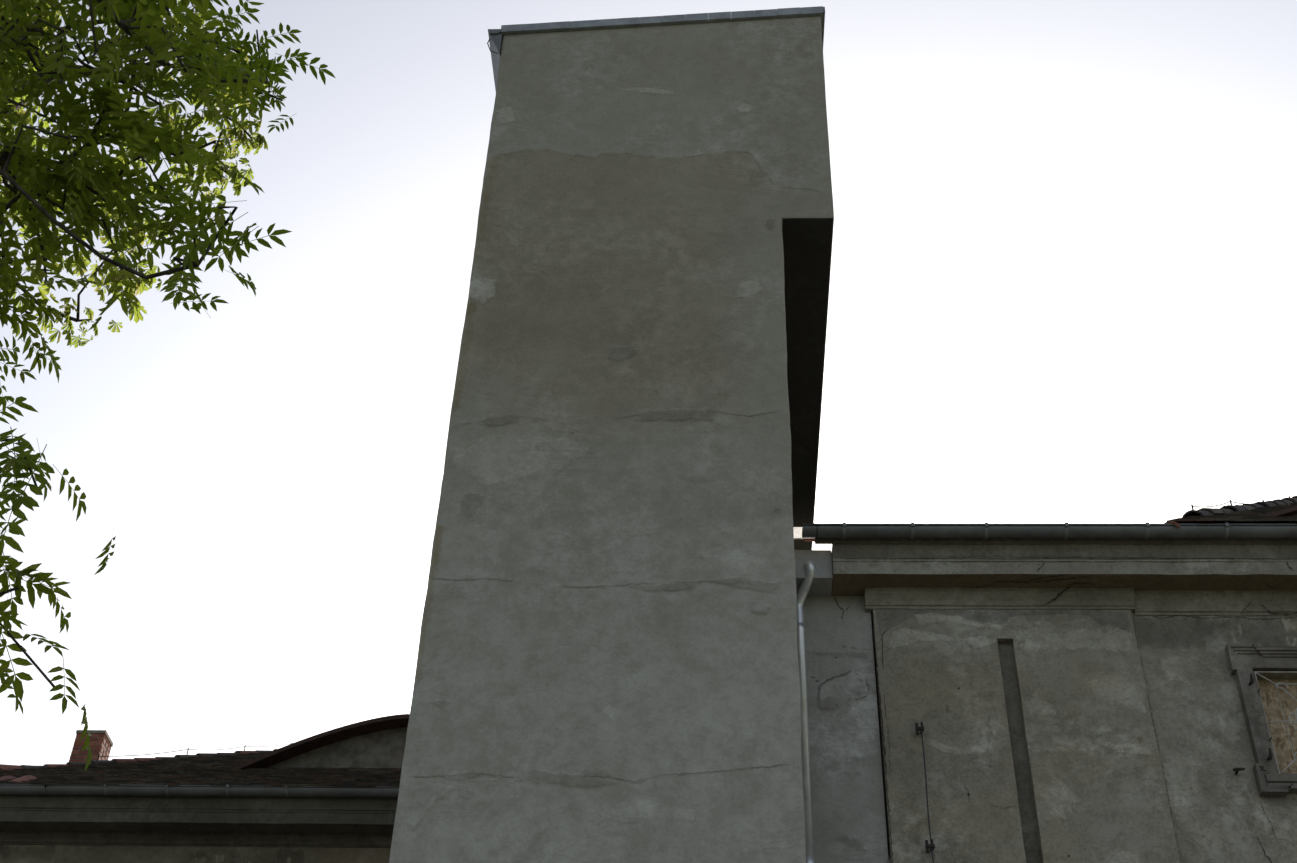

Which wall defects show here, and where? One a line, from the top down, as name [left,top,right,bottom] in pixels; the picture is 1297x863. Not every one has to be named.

crack [927,555,1297,863]